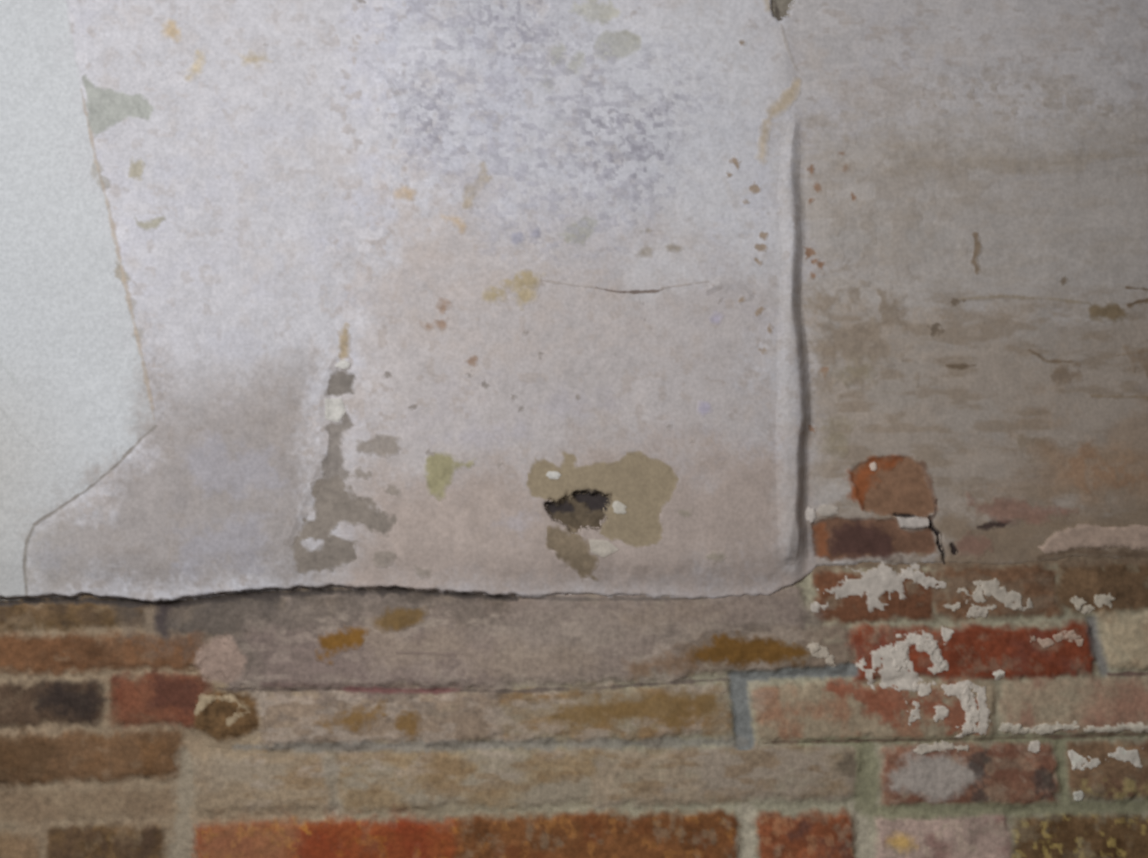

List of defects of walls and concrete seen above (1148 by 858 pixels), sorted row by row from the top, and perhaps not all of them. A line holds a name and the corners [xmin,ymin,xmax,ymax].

spalling [761,0,797,22]
peeling [80,73,156,421]
crack [539,278,710,295]
water stain [790,61,1148,465]
flaking render [290,322,403,576]
crack [0,424,708,642]
spalling [525,449,680,585]
spalling [804,453,1036,621]
crack [891,498,959,565]
flaking render [954,490,1148,562]
peeling [1068,592,1116,615]
peeling [854,625,1148,772]